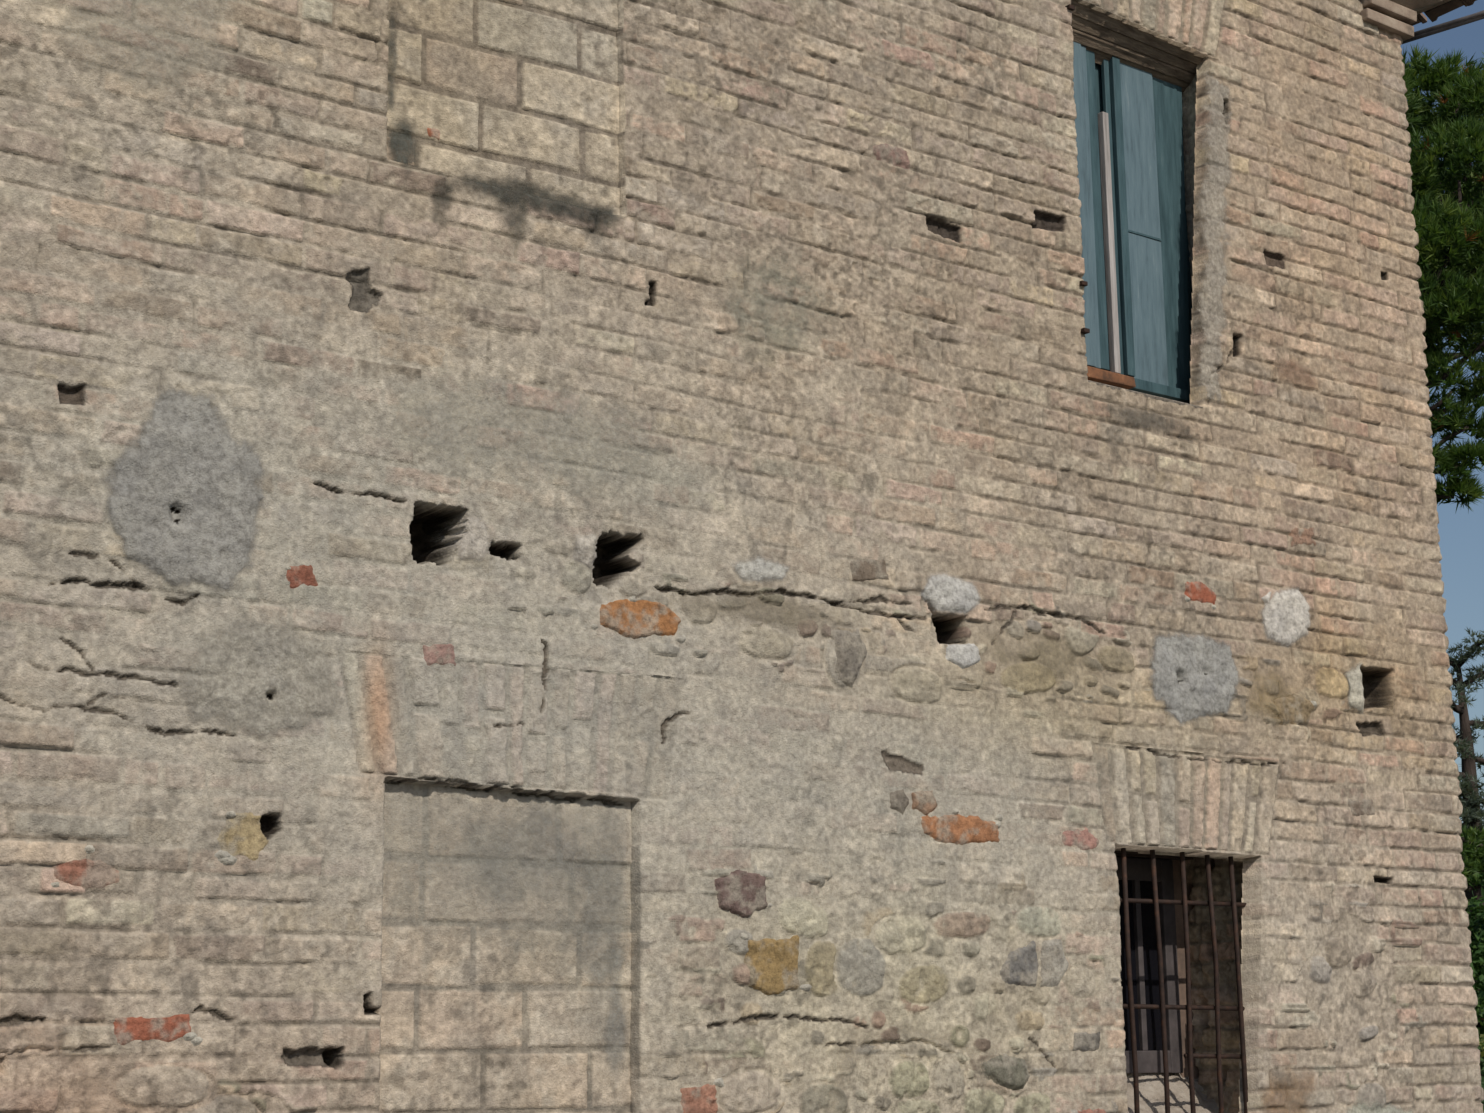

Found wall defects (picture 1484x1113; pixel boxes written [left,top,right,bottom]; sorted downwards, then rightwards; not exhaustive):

leakage [388,38,396,61]
leakage [389,122,415,164]
leakage [464,177,616,233]
spalling [346,268,382,312]
spalling [409,507,457,566]
crack [50,552,197,606]
spalling [591,536,686,643]
crack [654,586,926,632]
crack [984,604,1105,644]
crack [0,638,234,737]
crack [494,639,548,728]
crack [707,1014,873,1048]